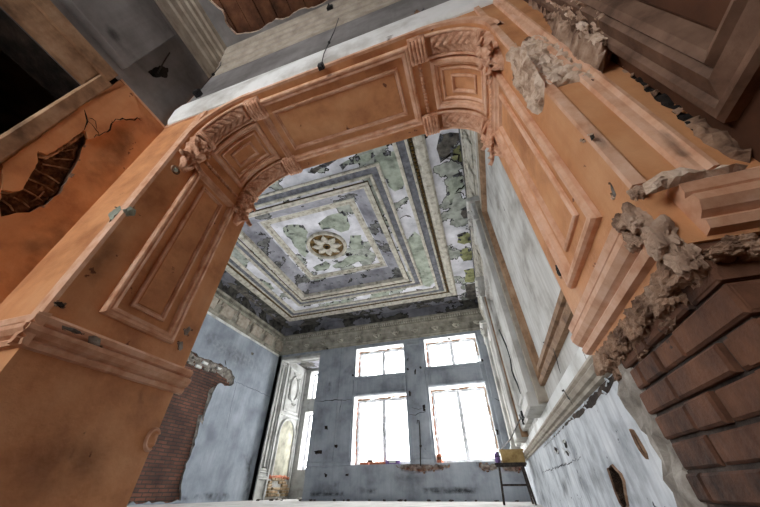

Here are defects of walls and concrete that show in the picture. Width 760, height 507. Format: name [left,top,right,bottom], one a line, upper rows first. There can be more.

spalling [505,0,613,115]
flaking render [0,85,141,216]
crack [84,110,140,138]
peeling [308,151,404,191]
peeling [437,132,465,205]
peeling [283,225,309,257]
peeling [313,210,369,271]
peeling [449,232,477,303]
flaking render [543,66,760,507]
flaking render [177,326,234,385]
spalling [396,464,450,474]
spalling [479,460,521,473]